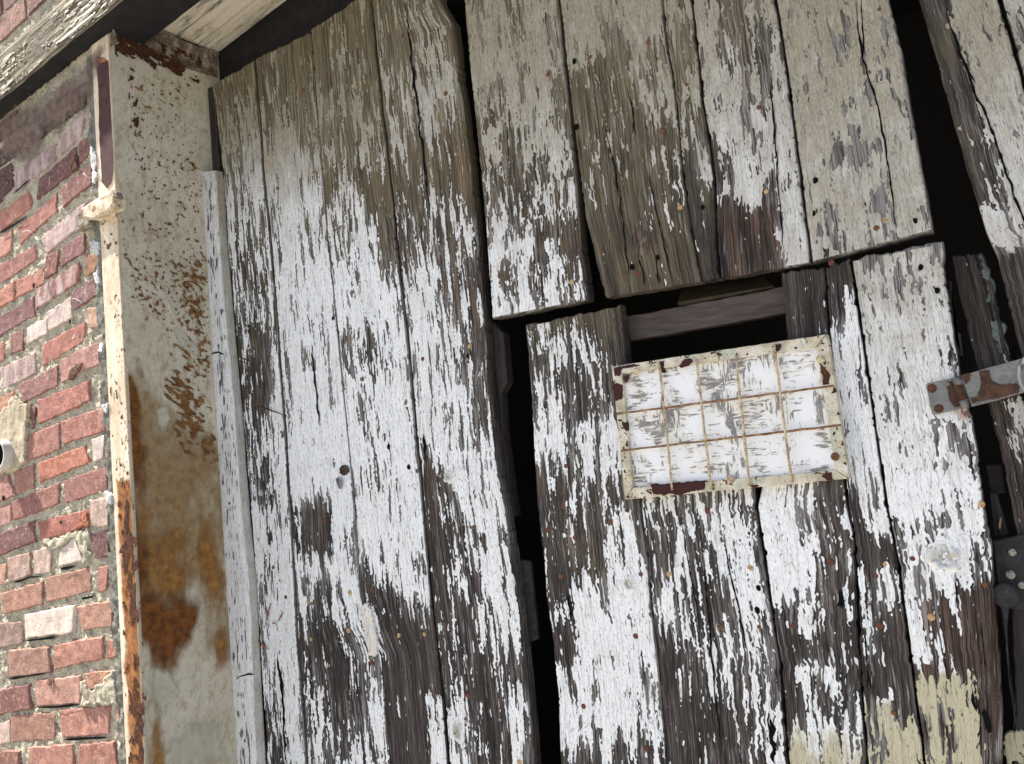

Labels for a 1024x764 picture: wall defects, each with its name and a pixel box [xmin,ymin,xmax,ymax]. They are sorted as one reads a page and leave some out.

crack [856,0,896,227]
rust [96,34,230,764]
peeling [213,0,1024,764]
rust [612,364,639,401]
rust [678,350,722,368]
rust [769,338,837,400]
rust [947,370,1020,407]
rust [616,414,732,498]